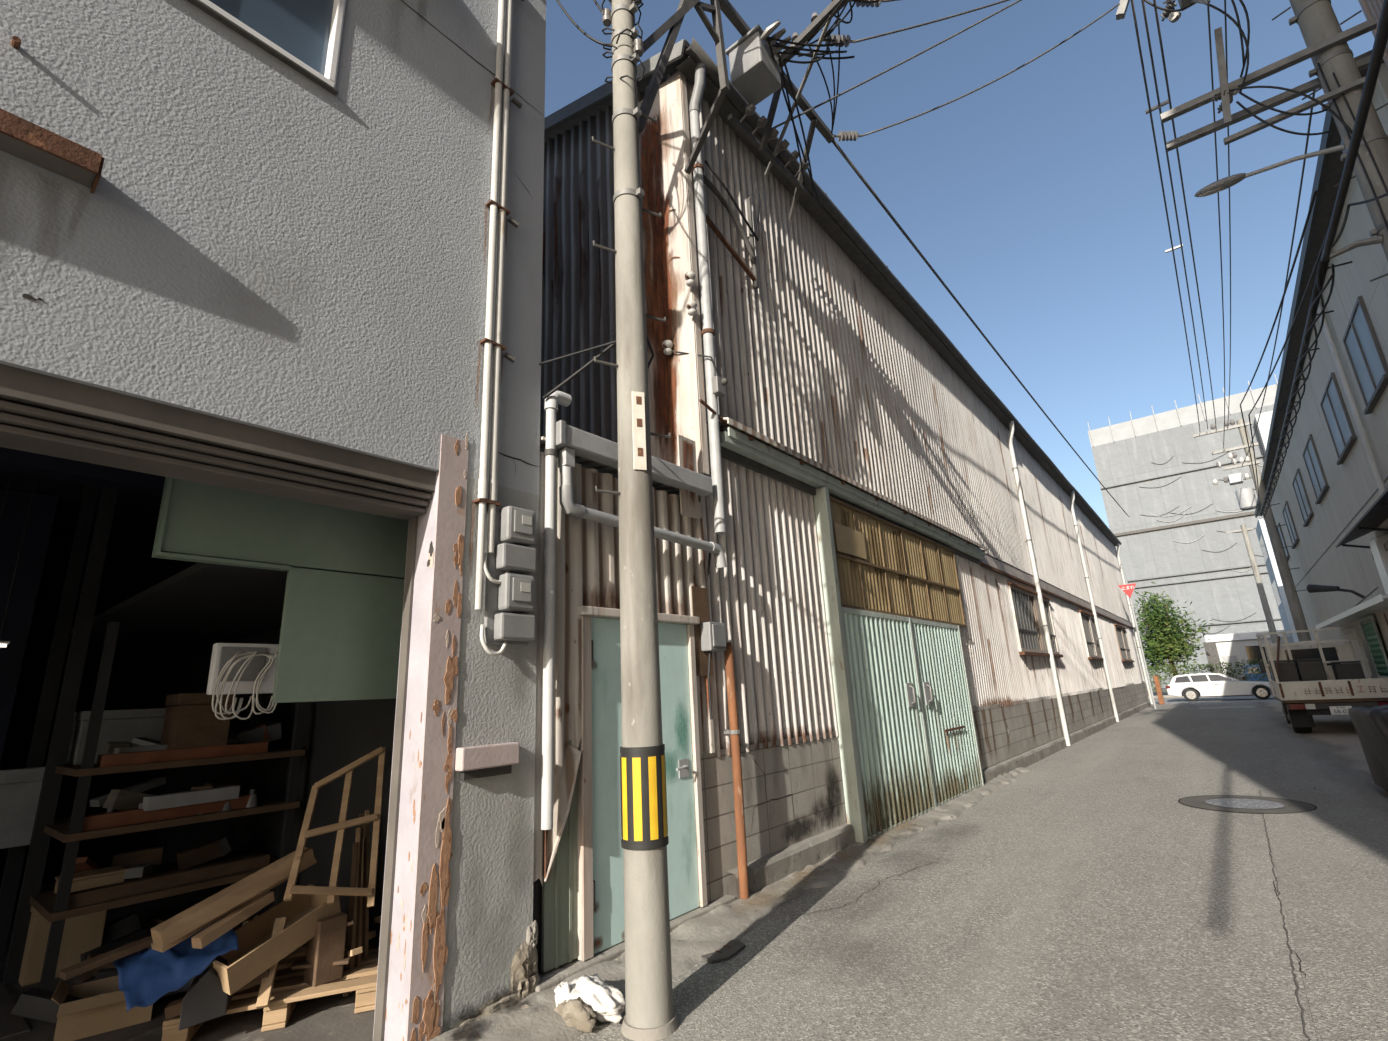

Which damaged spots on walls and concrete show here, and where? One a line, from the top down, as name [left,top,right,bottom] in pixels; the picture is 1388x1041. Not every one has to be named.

corrosion [543,178,563,316]
corrosion [641,116,693,471]
peeling [386,534,464,1041]
spalling [460,920,540,1026]
damp [745,707,1009,906]
crack [1259,790,1311,1041]